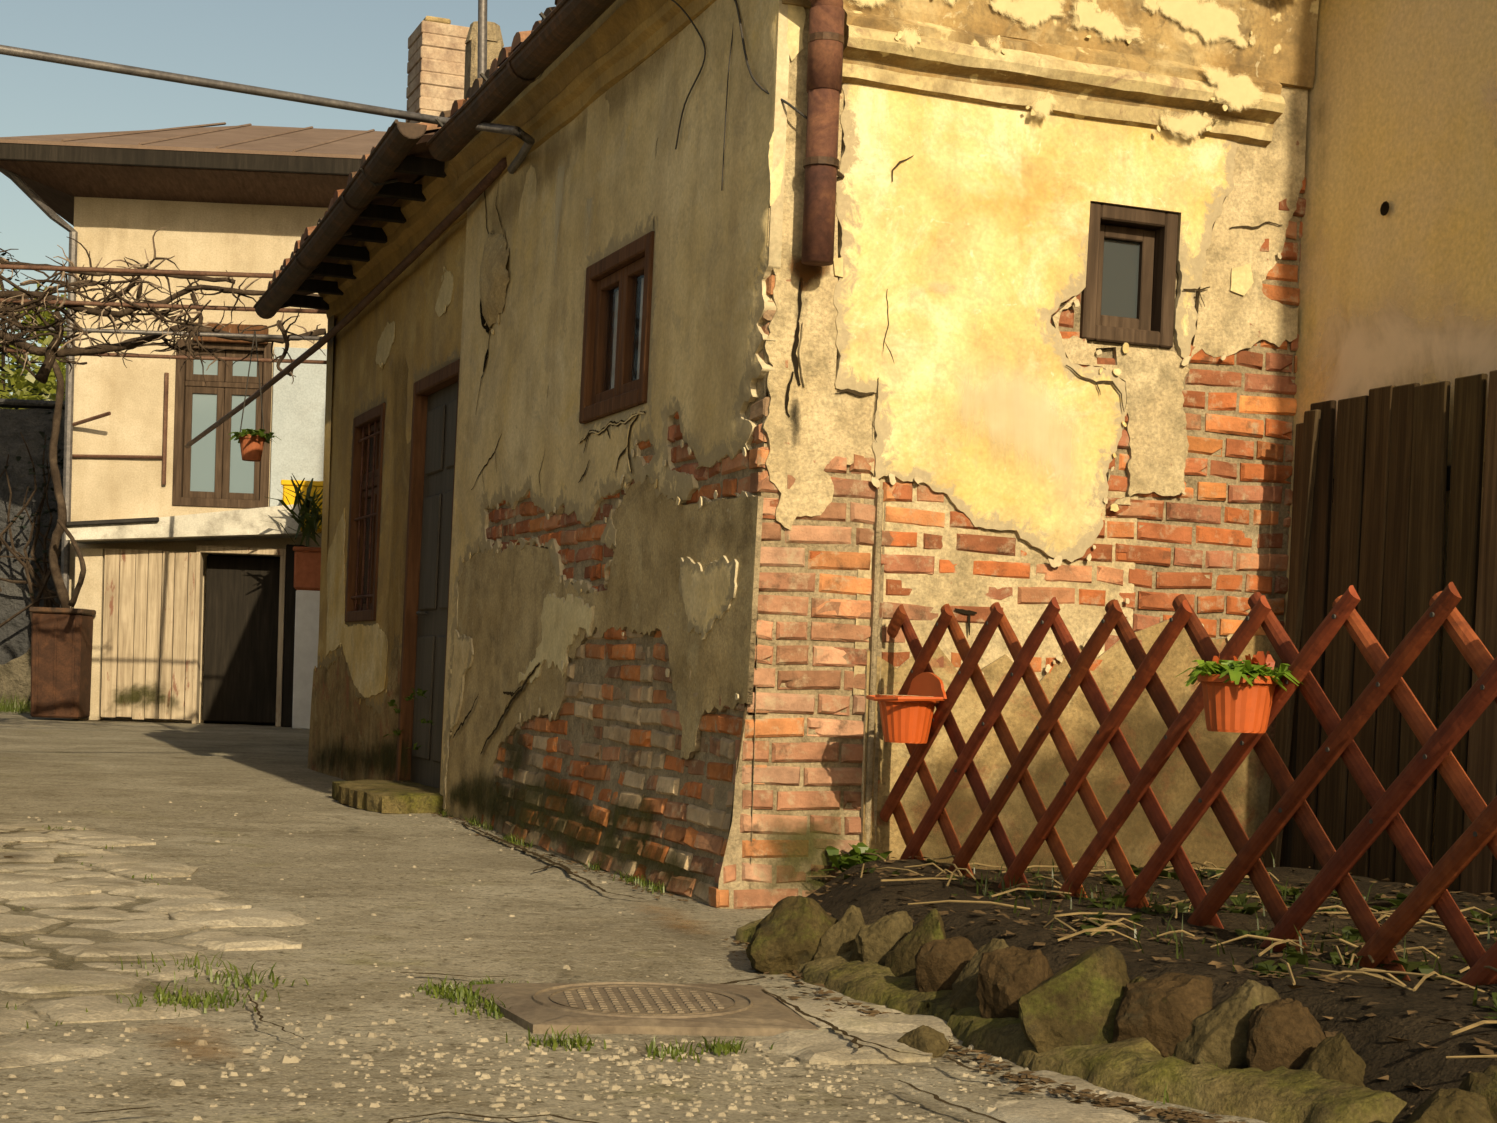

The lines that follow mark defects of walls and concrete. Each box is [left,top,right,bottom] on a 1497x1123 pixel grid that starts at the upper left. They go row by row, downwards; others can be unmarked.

flaking render [445,0,1308,909]